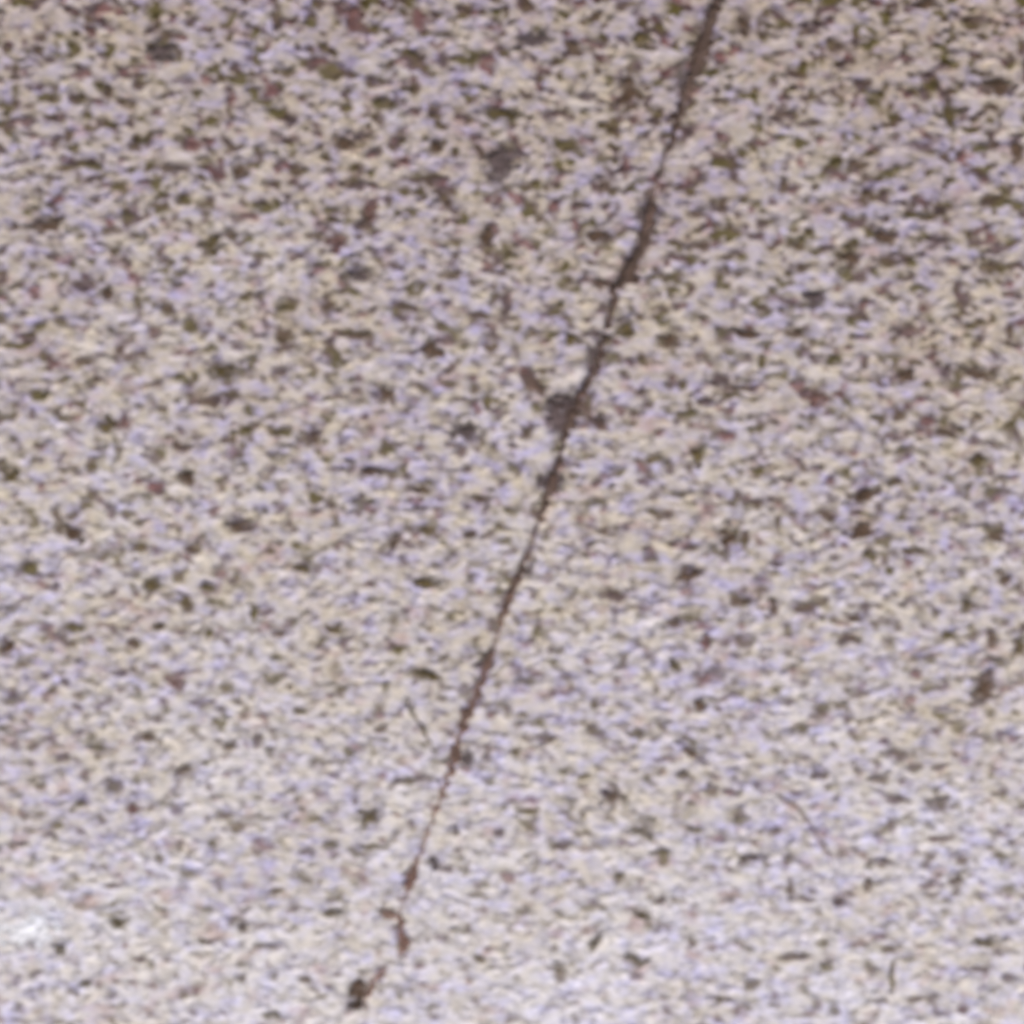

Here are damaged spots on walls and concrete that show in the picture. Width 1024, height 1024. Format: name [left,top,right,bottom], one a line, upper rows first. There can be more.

crack [348,0,722,1011]